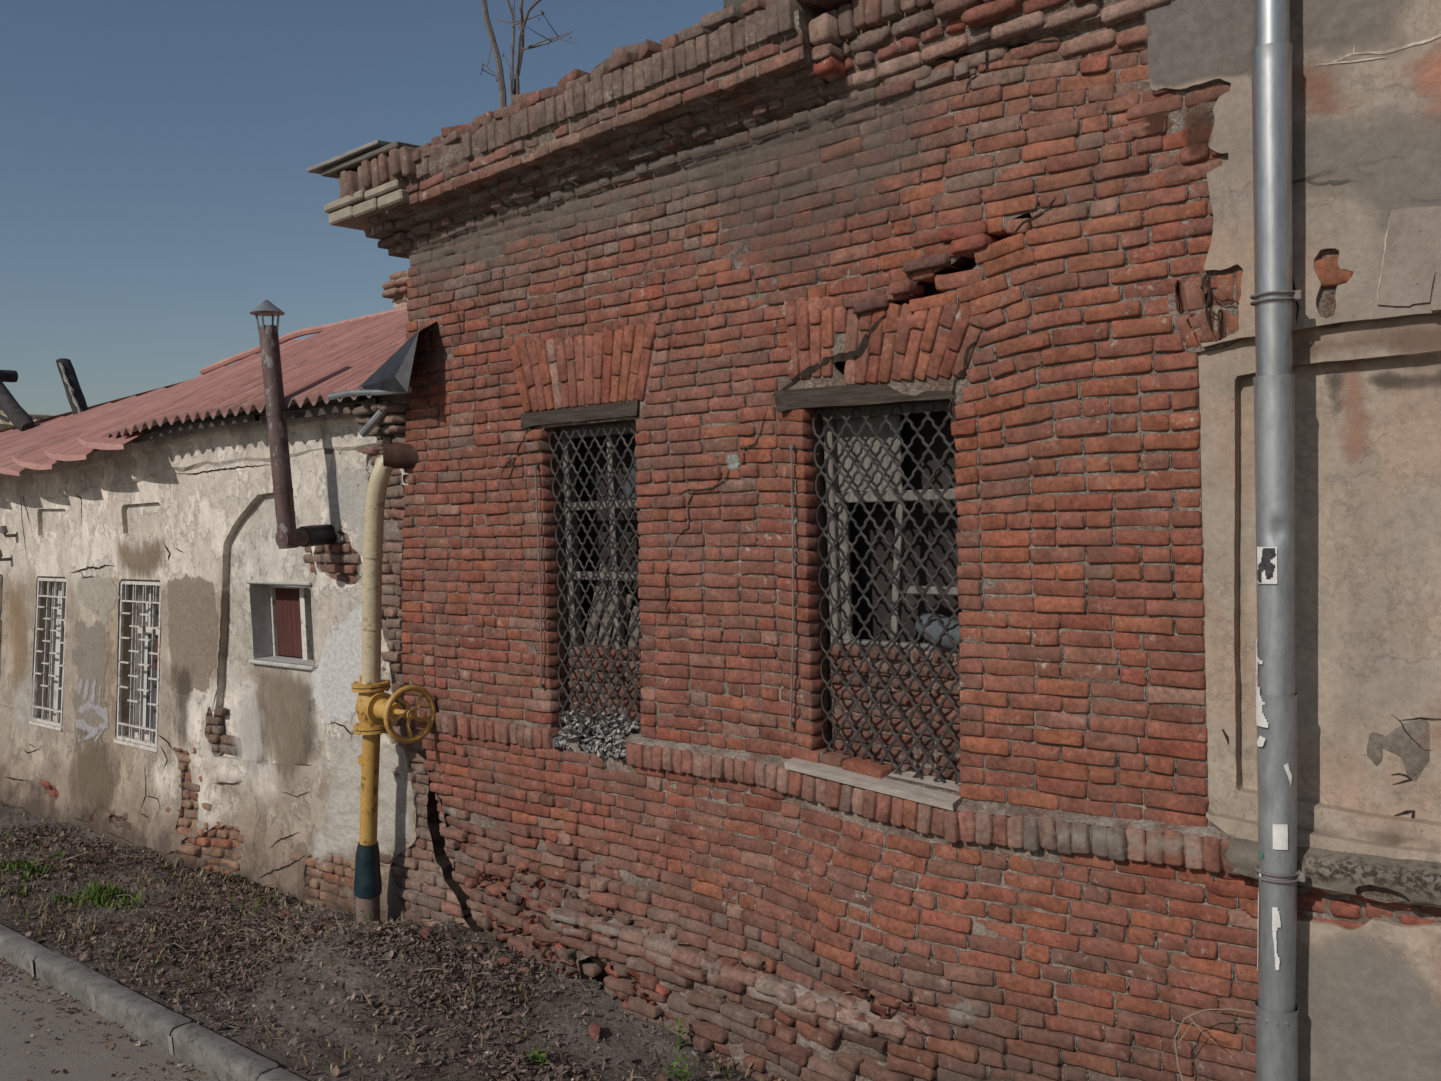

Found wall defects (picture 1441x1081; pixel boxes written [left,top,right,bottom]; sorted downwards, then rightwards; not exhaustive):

spalling [1095,80,1247,353]
spalling [1314,249,1353,328]
crack [664,197,1056,621]
peeling [303,425,394,585]
spalling [105,707,244,874]
water stain [177,670,190,739]
spalling [289,850,356,913]
peeling [311,604,362,725]
crack [417,748,485,932]
spalling [380,469,720,1010]
spalling [1297,885,1441,929]
crack [1391,714,1441,818]